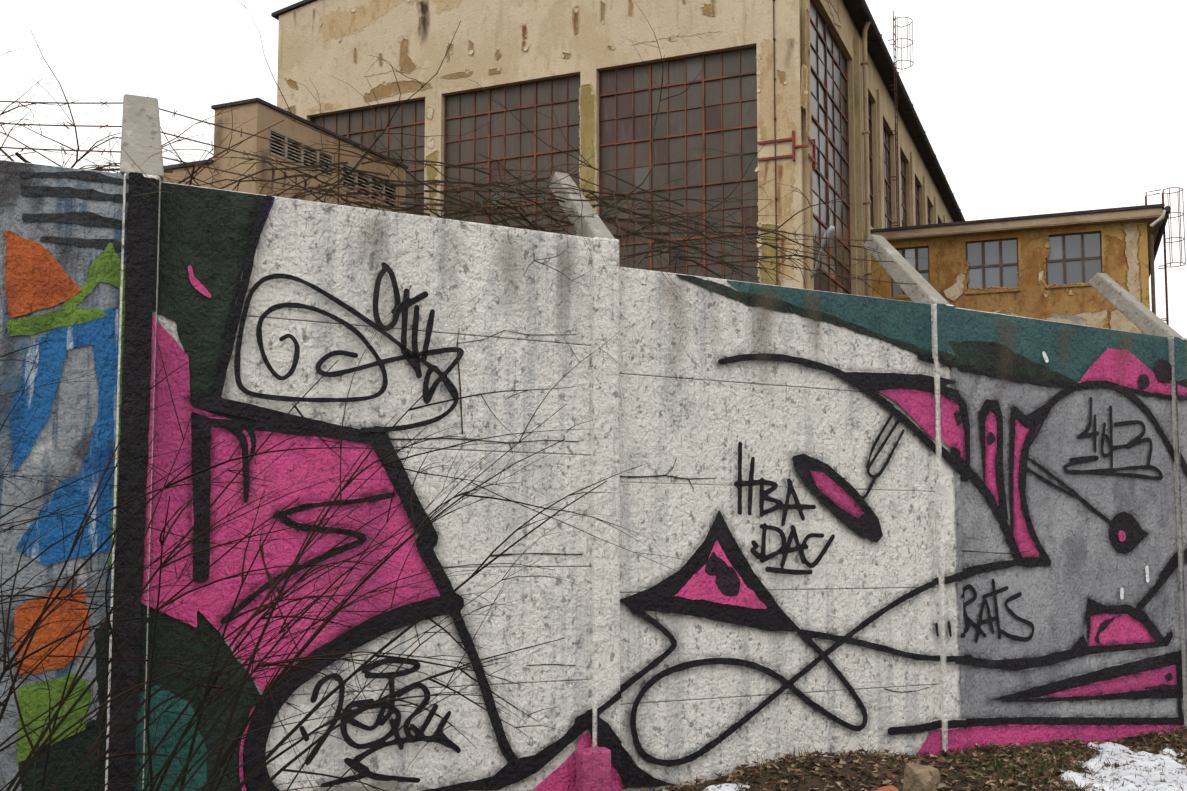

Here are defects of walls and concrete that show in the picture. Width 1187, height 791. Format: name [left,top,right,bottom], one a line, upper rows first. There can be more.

peeling [318,0,462,64]
peeling [363,35,473,103]
peeling [488,46,502,75]
peeling [572,8,580,35]
peeling [700,0,717,17]
peeling [425,137,440,213]
peeling [935,234,1144,334]
peeling [1102,221,1143,303]